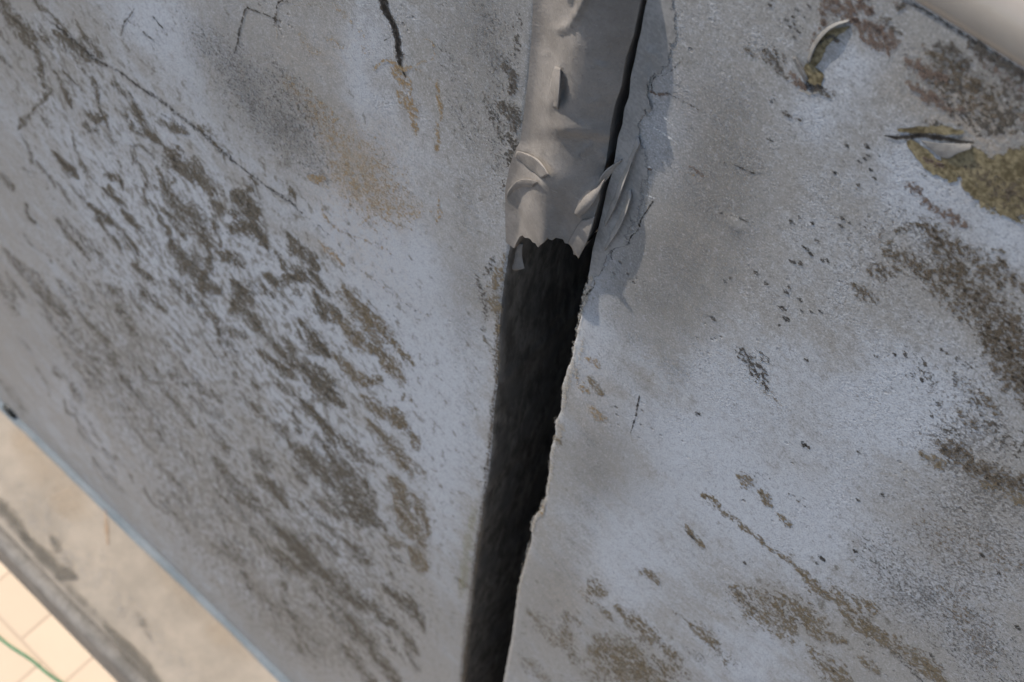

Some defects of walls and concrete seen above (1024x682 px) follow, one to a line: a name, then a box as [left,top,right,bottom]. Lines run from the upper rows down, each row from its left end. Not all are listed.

crack [234,0,288,53]
crack [379,0,408,78]
peeling [792,19,850,95]
damp [807,0,1024,137]
crack [47,18,328,234]
peeling [883,119,1024,224]
crack [611,201,654,260]
damp [0,0,432,682]
damp [850,173,1024,507]
damp [685,524,705,550]
damp [736,471,792,528]
damp [701,492,1024,682]